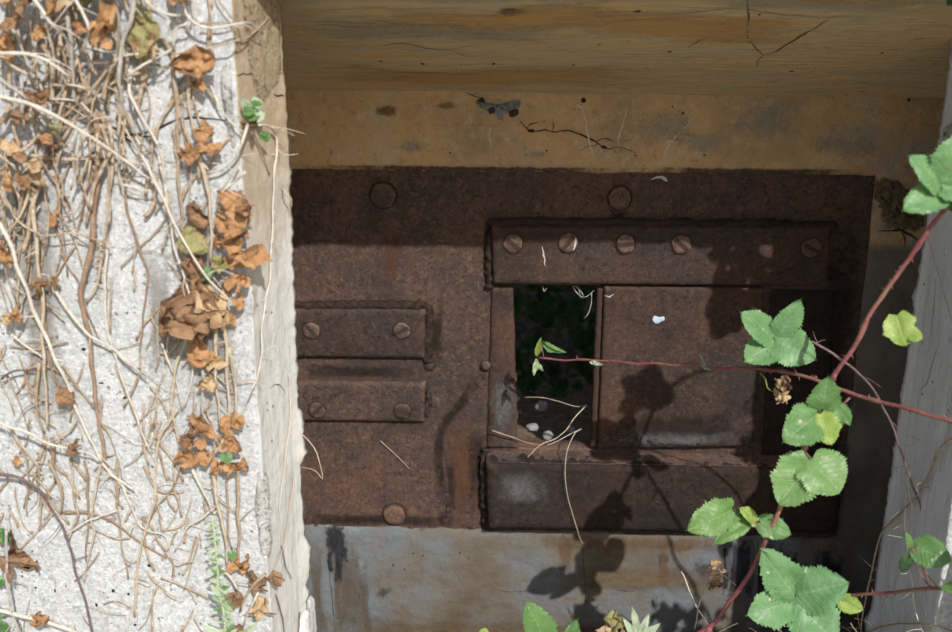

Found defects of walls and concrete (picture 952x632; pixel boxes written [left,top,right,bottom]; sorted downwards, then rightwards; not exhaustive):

crack [651,2,829,66]
spalling [476,97,522,120]
crack [520,121,635,153]
spalling [872,176,925,232]
corrosion [829,237,858,387]
corrosion [312,365,392,377]
corrosion [621,413,729,445]
corrosion [435,392,468,504]
corrosion [321,503,449,525]
water stain [327,551,343,581]
corrosion [314,572,323,621]